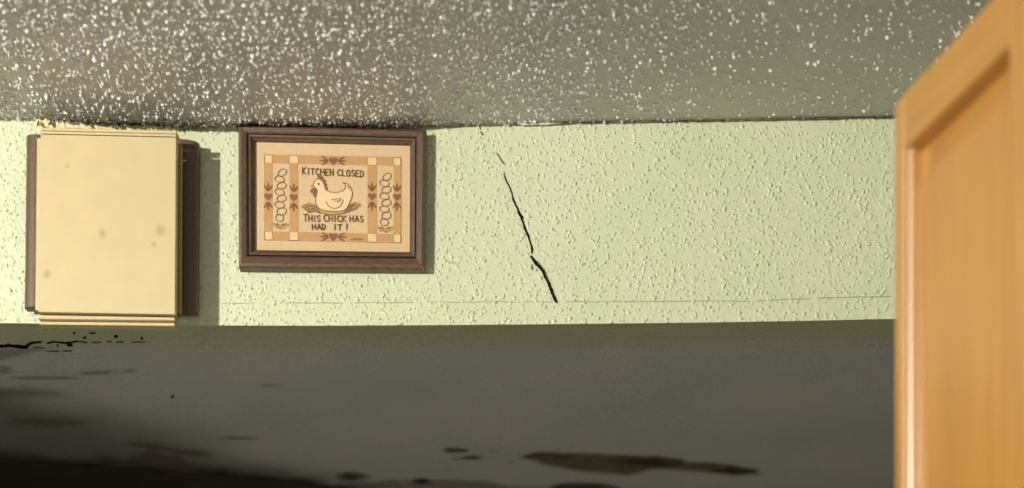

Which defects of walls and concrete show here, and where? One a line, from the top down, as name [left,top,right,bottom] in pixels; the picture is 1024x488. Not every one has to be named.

crack [429,117,893,303]
crack [290,298,513,306]
damp [525,453,756,488]